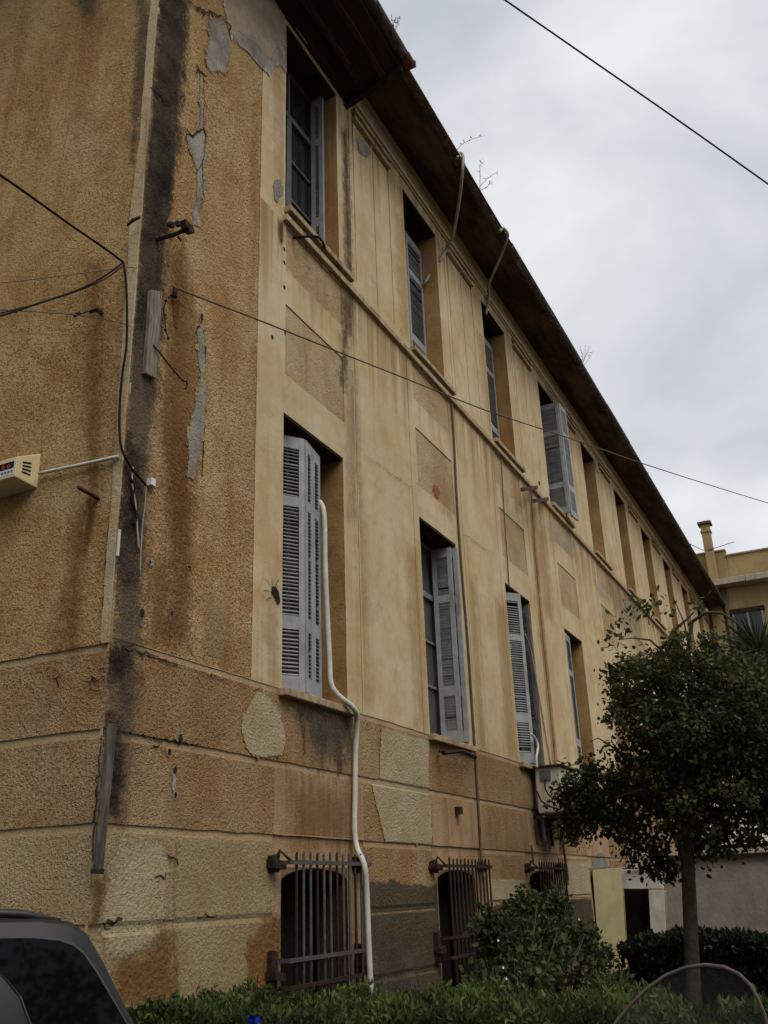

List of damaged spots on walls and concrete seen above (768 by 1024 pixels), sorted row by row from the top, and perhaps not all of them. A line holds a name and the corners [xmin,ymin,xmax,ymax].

flaking render [186,0,287,227]
damp [342,132,352,272]
damp [103,0,190,828]
flaking render [186,312,208,480]
damp [340,287,353,387]